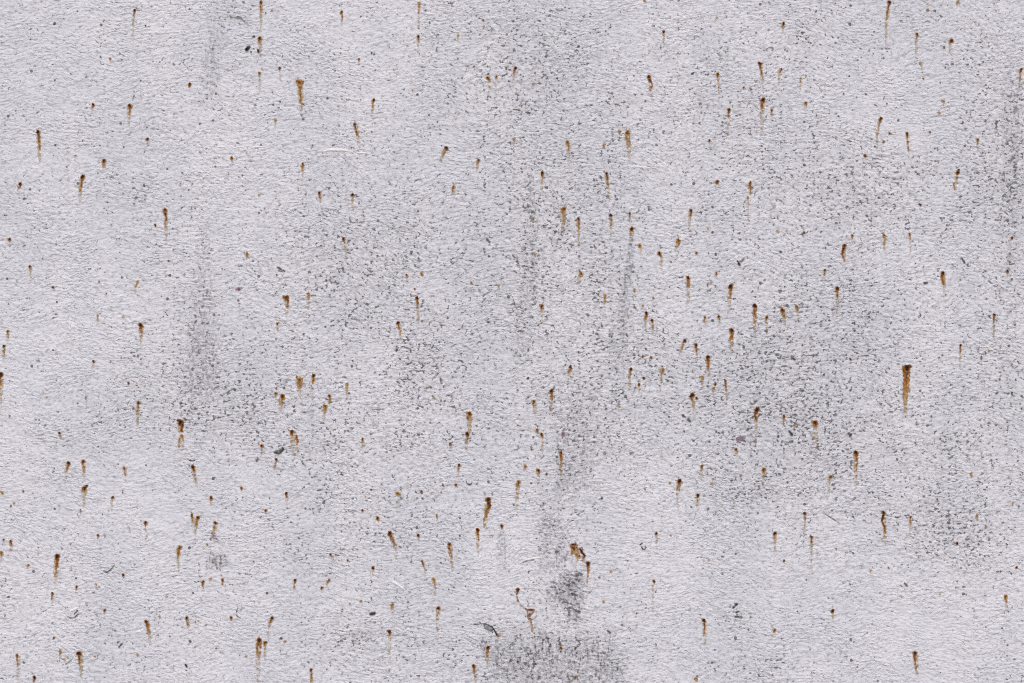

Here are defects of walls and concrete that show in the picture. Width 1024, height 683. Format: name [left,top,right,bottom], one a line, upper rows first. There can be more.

rust [679,339,728,408]
rust [902,365,912,412]
rust [476,497,491,548]
rust [570,543,590,583]
rust [245,616,273,670]